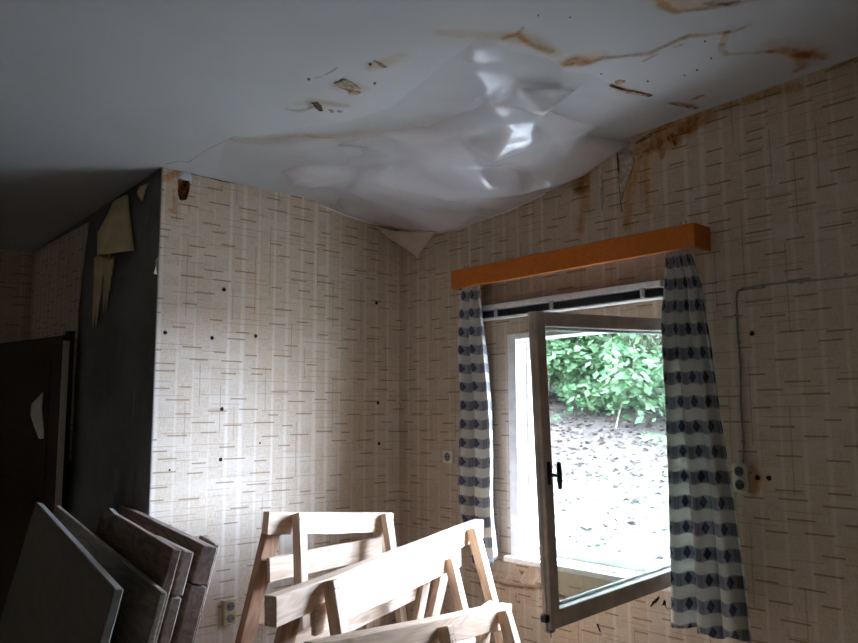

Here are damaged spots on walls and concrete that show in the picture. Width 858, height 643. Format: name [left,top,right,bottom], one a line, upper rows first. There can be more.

peeling [334,79,361,95]
peeling [609,80,652,97]